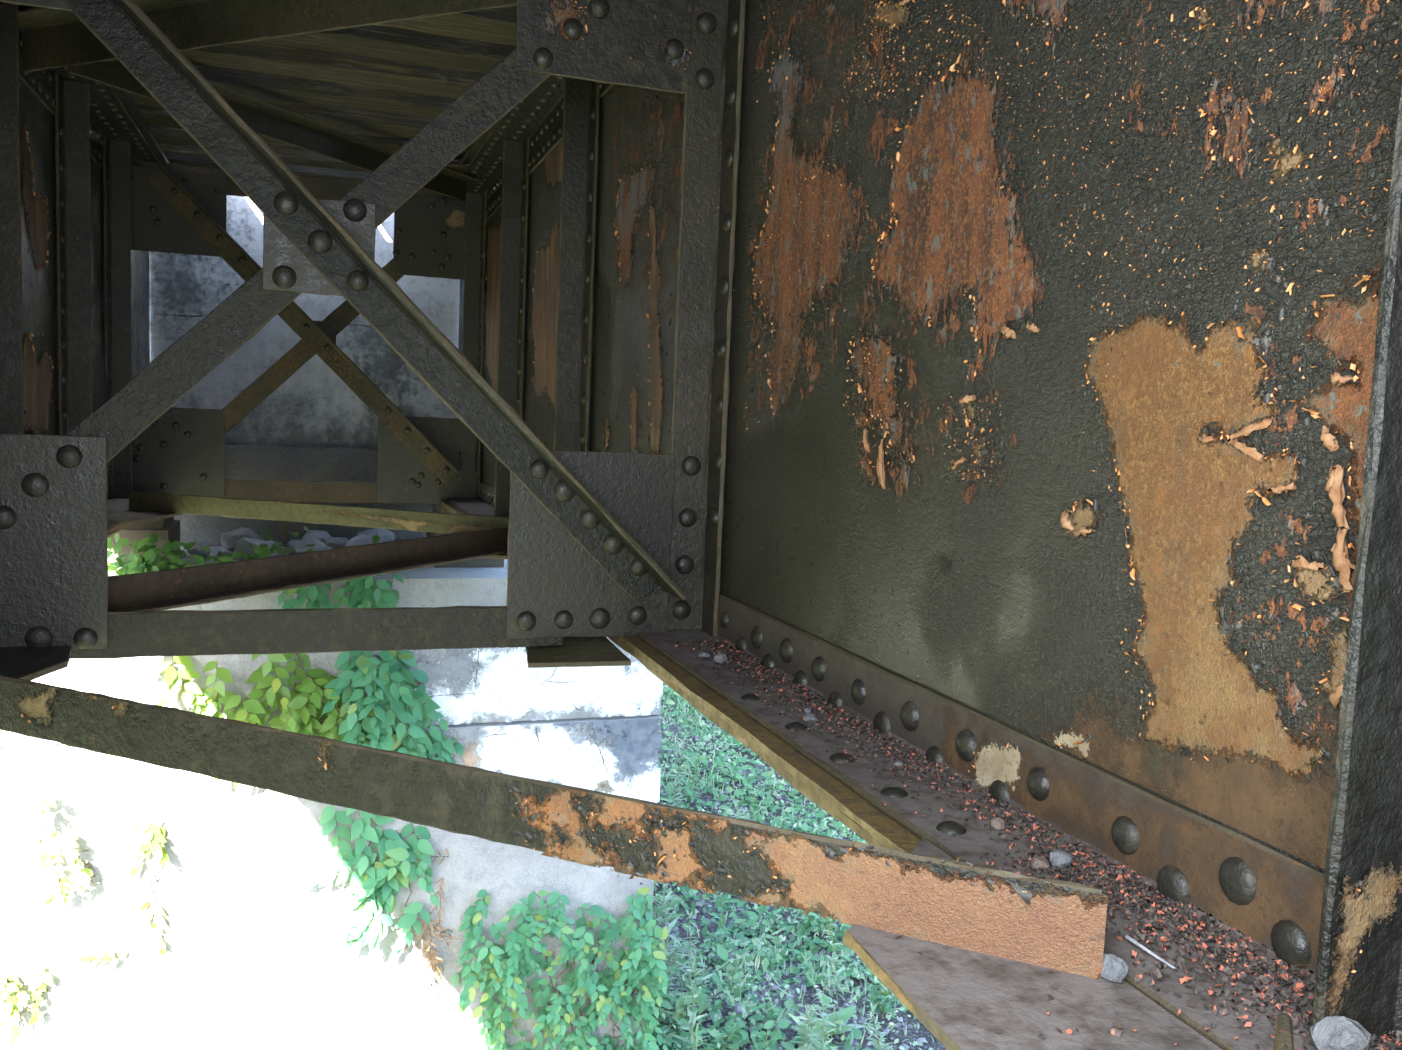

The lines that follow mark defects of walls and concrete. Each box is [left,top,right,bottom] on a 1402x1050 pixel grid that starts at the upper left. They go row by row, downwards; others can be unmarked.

rust [630,198,664,454]
peeling [743,0,1402,791]
peeling [508,780,776,897]